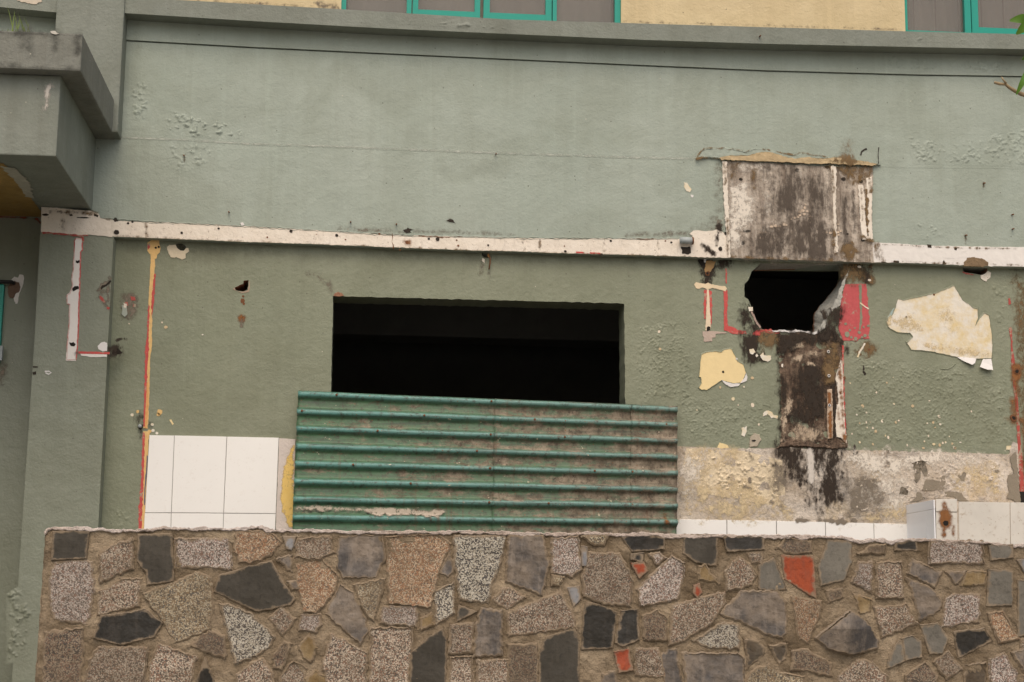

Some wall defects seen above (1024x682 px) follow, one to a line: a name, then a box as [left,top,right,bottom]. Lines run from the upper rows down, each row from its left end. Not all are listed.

flaking render [696,143,881,181]
peeling [0,166,1024,529]
leakage [679,342,1005,525]
corrosion [939,502,954,537]